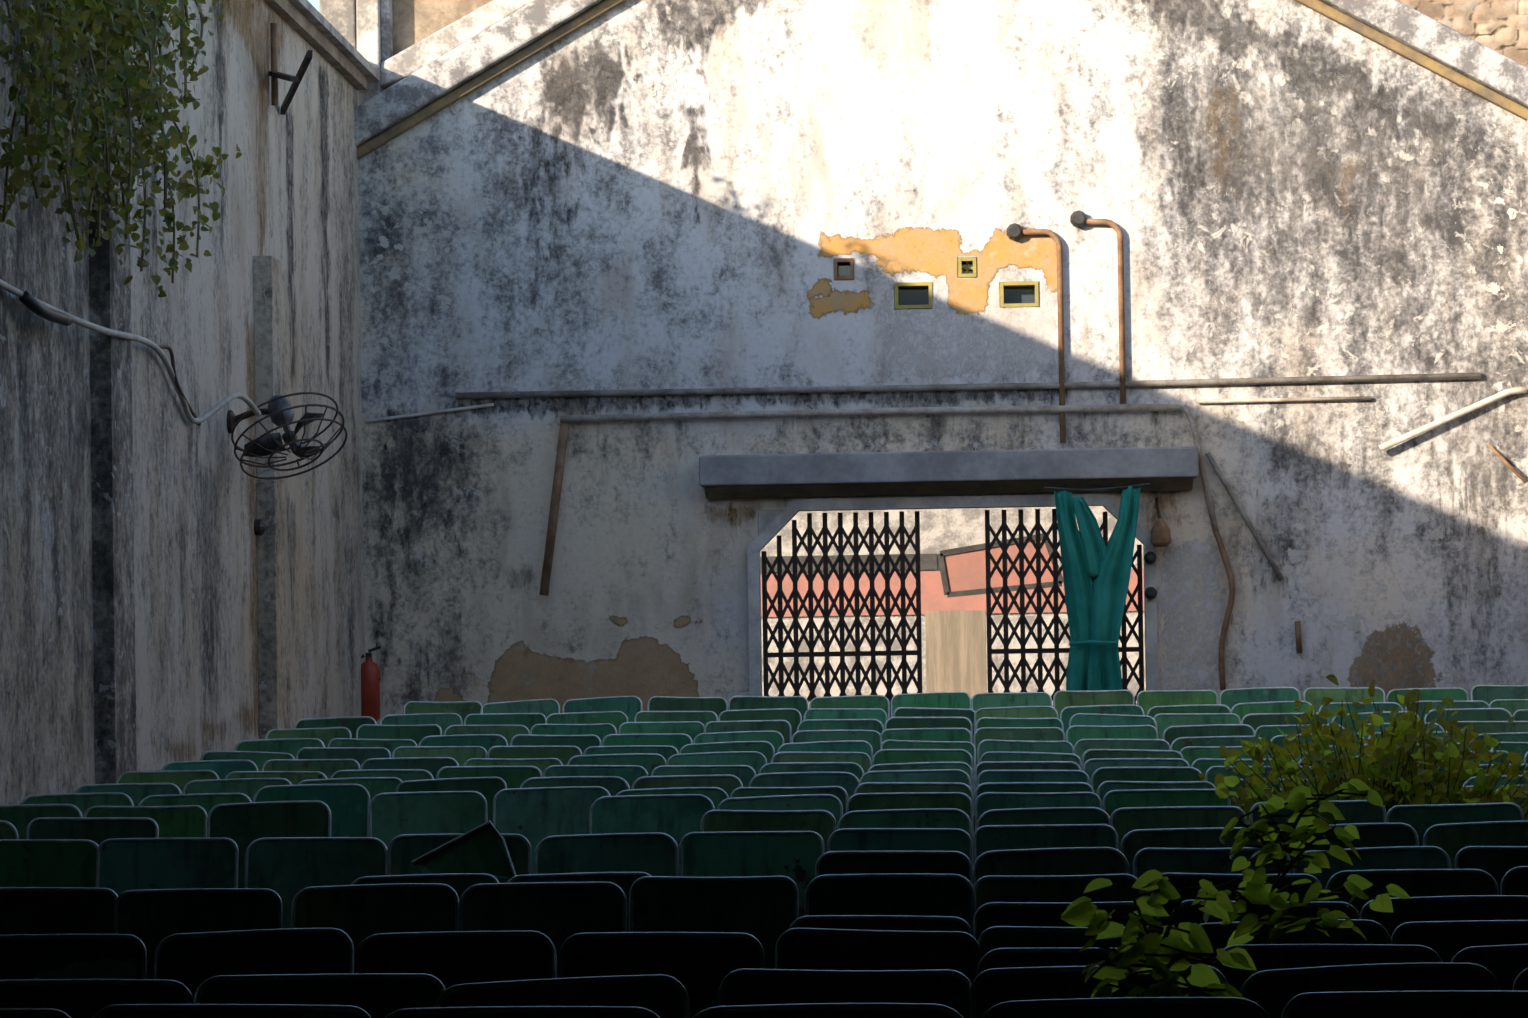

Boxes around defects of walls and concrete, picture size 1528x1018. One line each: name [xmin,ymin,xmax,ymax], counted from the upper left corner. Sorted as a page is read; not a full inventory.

water stain [657,0,766,78]
water stain [286,110,296,388]
water stain [319,67,330,375]
water stain [681,105,710,223]
flaking render [807,226,1057,379]
water stain [1130,0,1485,251]
water stain [458,389,1068,438]
water stain [364,407,465,696]
peeling [1229,521,1306,578]
flaking render [487,616,699,713]
flaking render [673,615,703,628]
flaking render [1286,580,1443,701]